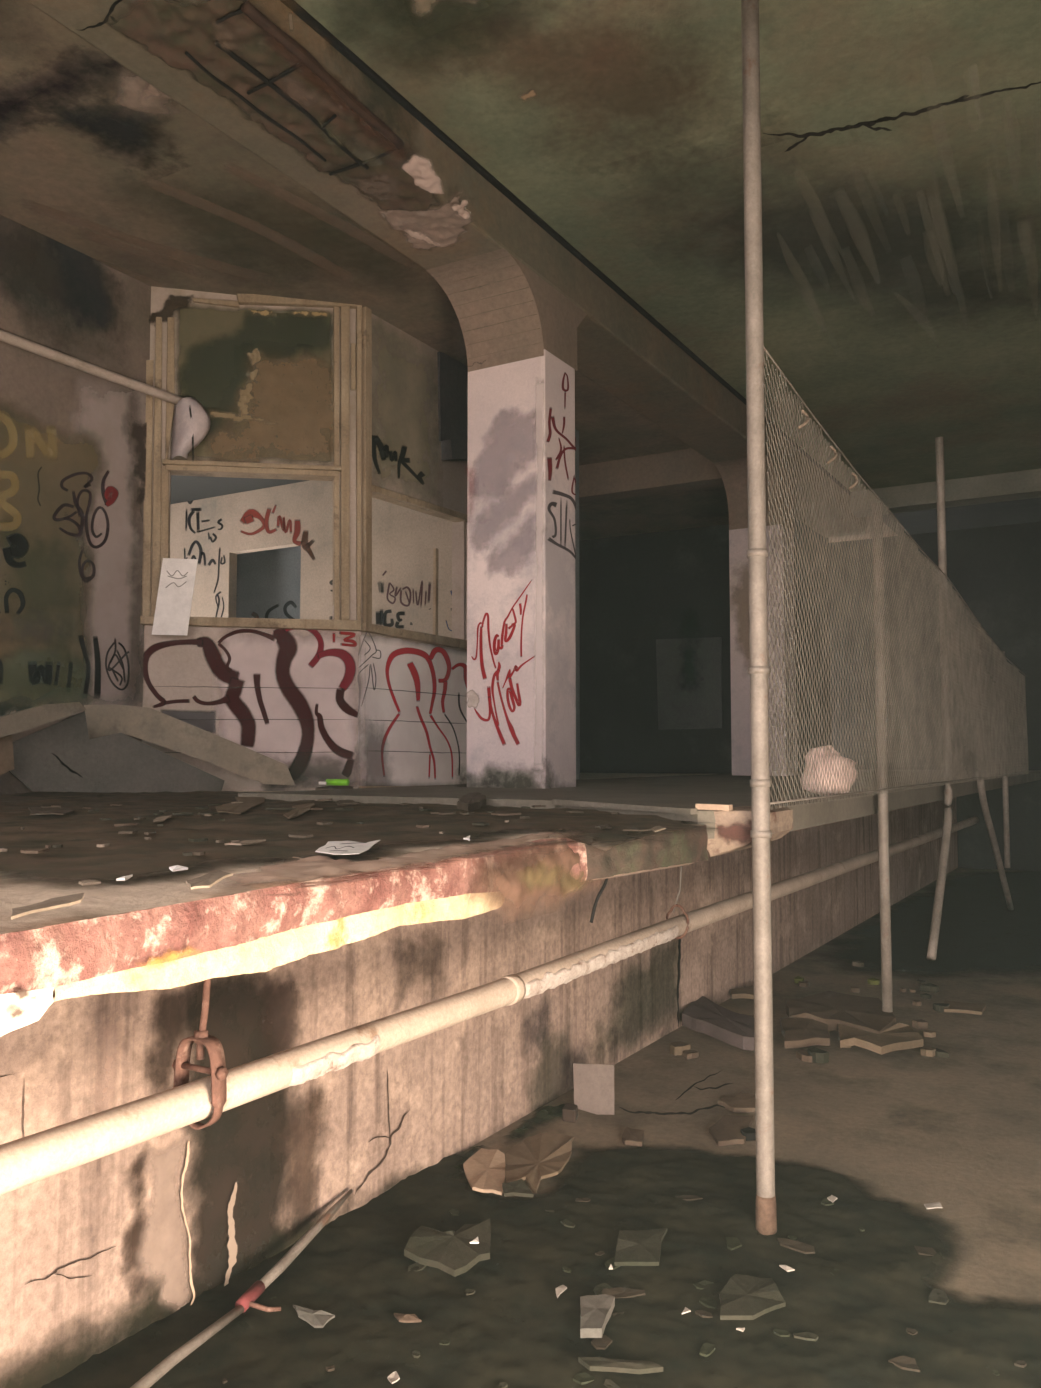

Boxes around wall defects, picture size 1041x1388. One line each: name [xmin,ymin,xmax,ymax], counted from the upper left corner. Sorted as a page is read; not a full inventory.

crack [76,0,122,31]
damp [0,56,124,133]
crack [764,81,1041,152]
damp [704,194,745,263]
damp [762,188,1018,307]
spalling [0,892,502,1037]
damp [145,973,298,1091]
peeling [289,1035,380,1086]
crack [354,1070,410,1196]
damp [0,1088,328,1388]